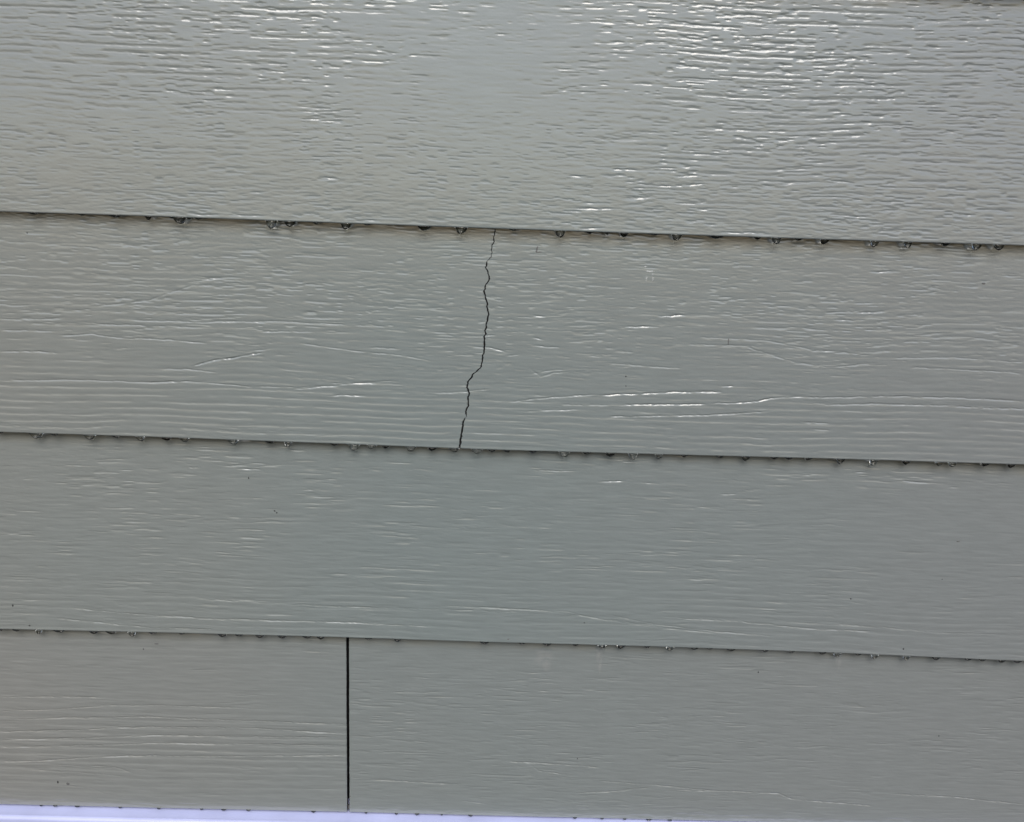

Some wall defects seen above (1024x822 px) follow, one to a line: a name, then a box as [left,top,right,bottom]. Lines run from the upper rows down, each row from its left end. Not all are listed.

crack [459,229,496,447]